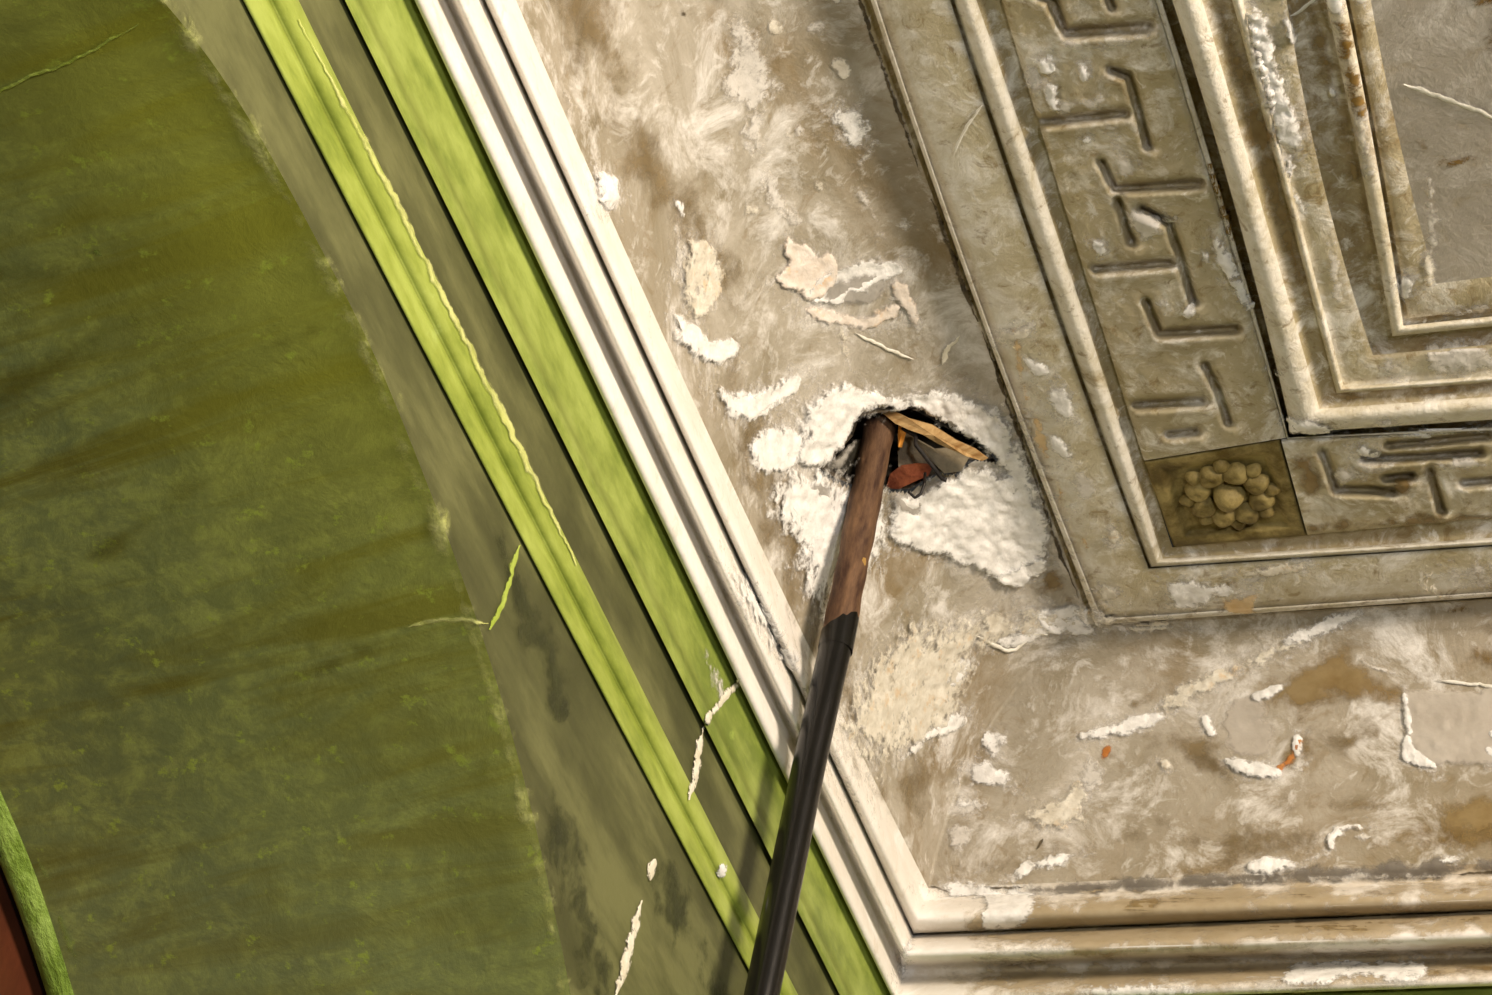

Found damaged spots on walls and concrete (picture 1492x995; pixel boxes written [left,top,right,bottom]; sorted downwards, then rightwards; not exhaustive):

crack [1290,0,1315,17]
crack [0,24,138,93]
crack [1404,84,1492,119]
peeling [666,200,745,371]
spalling [766,237,922,361]
leakage [740,420,761,451]
peeling [706,369,815,475]
leakage [748,468,805,564]
peeling [731,564,805,690]
leakage [1277,649,1400,706]
peeling [1402,693,1437,768]
leakage [967,796,1492,995]